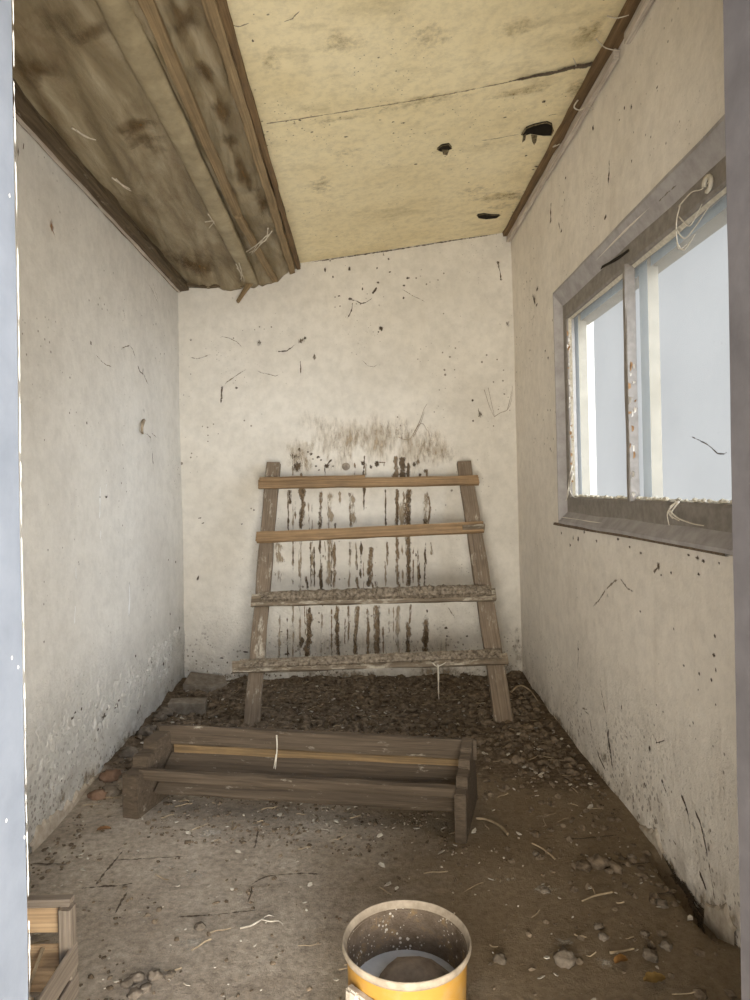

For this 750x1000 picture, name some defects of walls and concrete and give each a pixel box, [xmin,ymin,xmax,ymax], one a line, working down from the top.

crack [267,62,593,124]
damp [290,448,334,476]
damp [354,440,428,477]
damp [385,489,412,525]
damp [423,493,431,524]
damp [275,488,366,590]
damp [348,537,433,588]
damp [278,604,429,657]